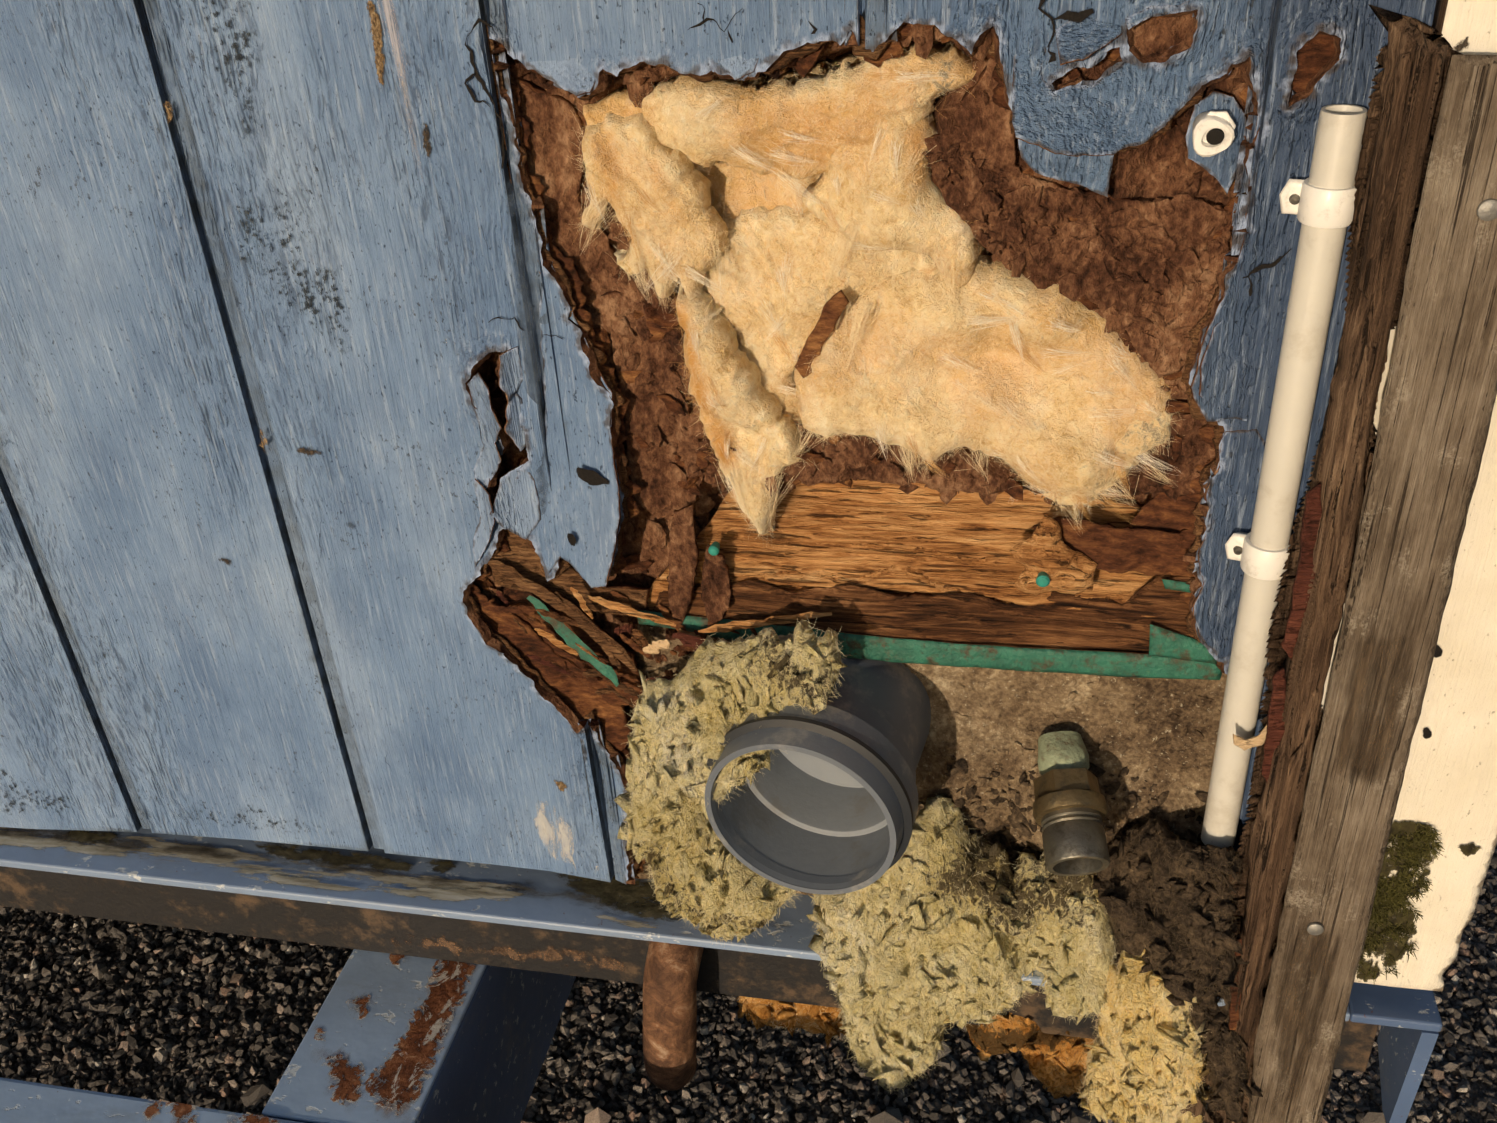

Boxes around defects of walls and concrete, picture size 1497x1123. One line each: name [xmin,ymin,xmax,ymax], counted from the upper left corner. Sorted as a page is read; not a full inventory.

peeling [720,56,759,81]
spalling [1291,34,1335,97]
peeling [924,0,1276,659]
peeling [467,58,732,752]
peeling [0,827,524,901]
corrosion [314,936,623,1116]
corrosion [142,1099,199,1123]
corrosion [227,1113,280,1123]